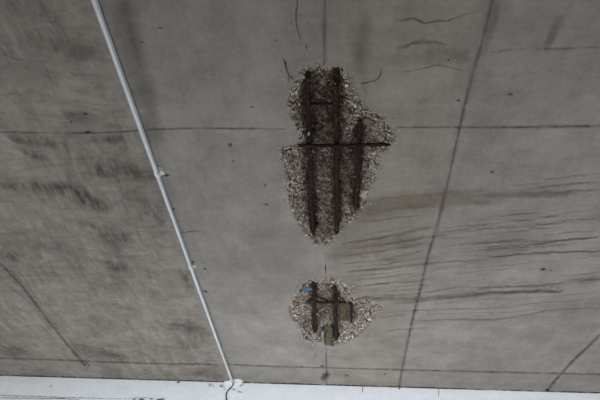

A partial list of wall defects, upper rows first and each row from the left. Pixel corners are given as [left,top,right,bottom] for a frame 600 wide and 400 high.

spalling [276,59,400,249]
spalling [285,276,382,348]